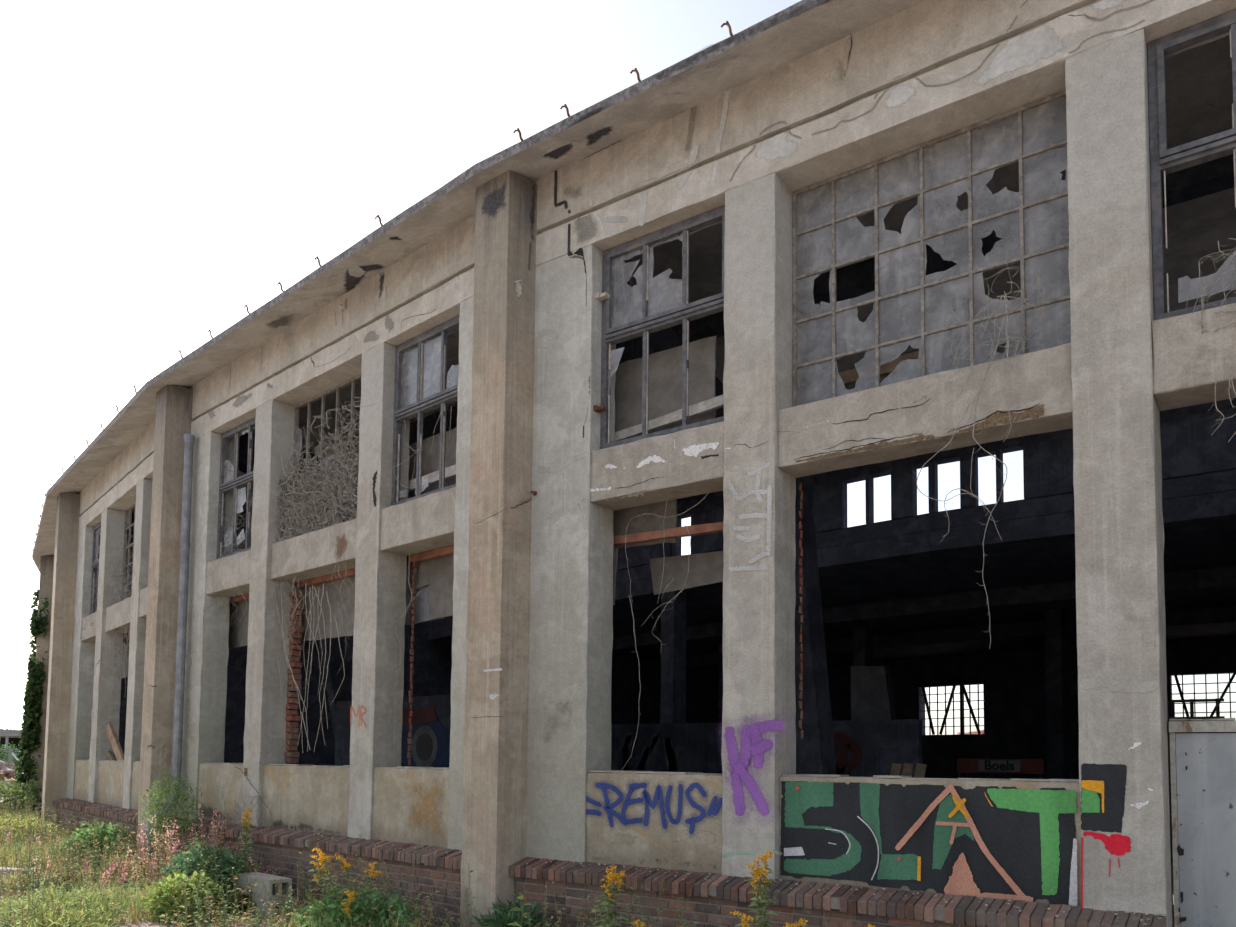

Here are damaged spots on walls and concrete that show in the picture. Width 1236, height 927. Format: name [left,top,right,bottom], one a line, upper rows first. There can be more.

peeling [570,107,605,127]
peeling [587,127,612,145]
peeling [544,143,572,159]
crack [554,140,621,256]
spalling [794,403,1044,463]
peeling [674,439,719,459]
peeling [605,454,668,469]